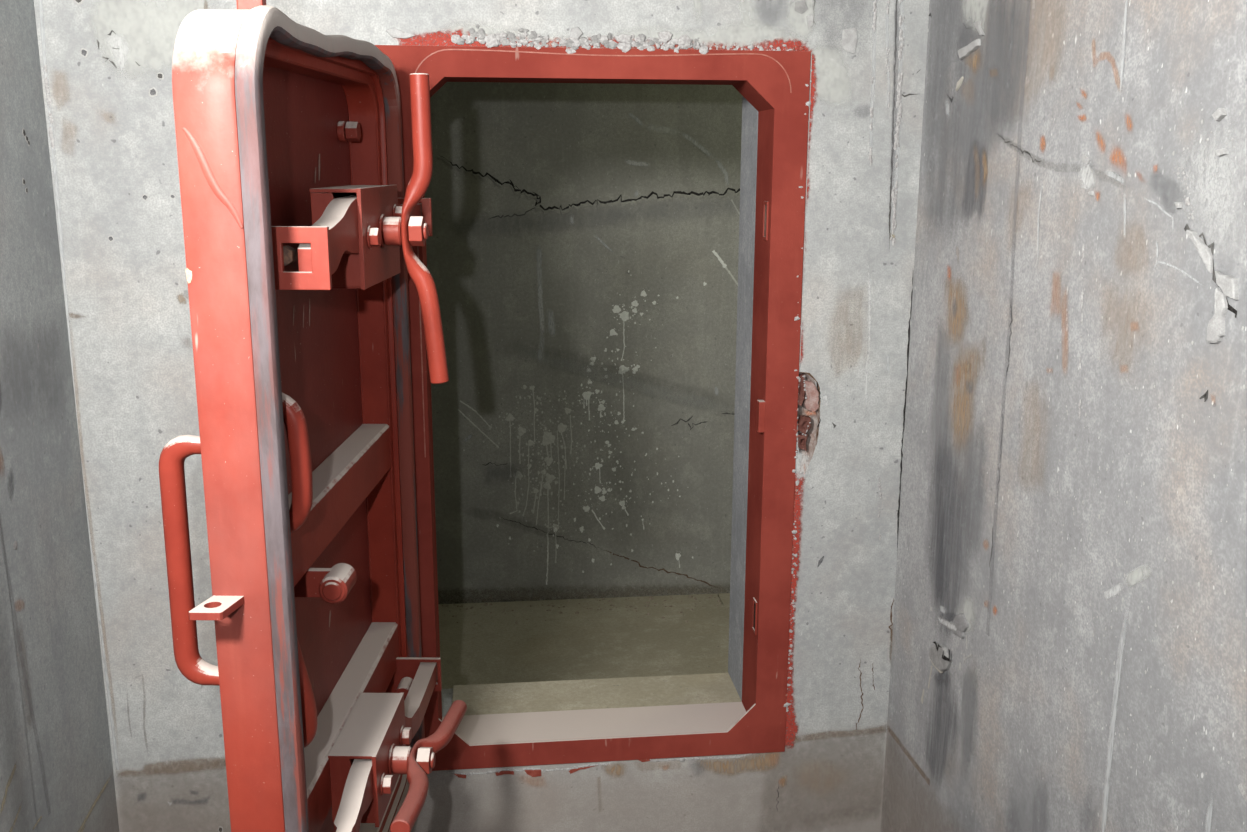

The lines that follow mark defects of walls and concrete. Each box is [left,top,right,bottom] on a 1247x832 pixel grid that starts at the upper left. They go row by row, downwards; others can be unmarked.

spalling [450,0,858,123]
crack [437,155,740,219]
crack [998,134,1041,162]
flaking render [1155,93,1239,343]
spalling [783,359,828,712]
spalling [929,641,953,682]